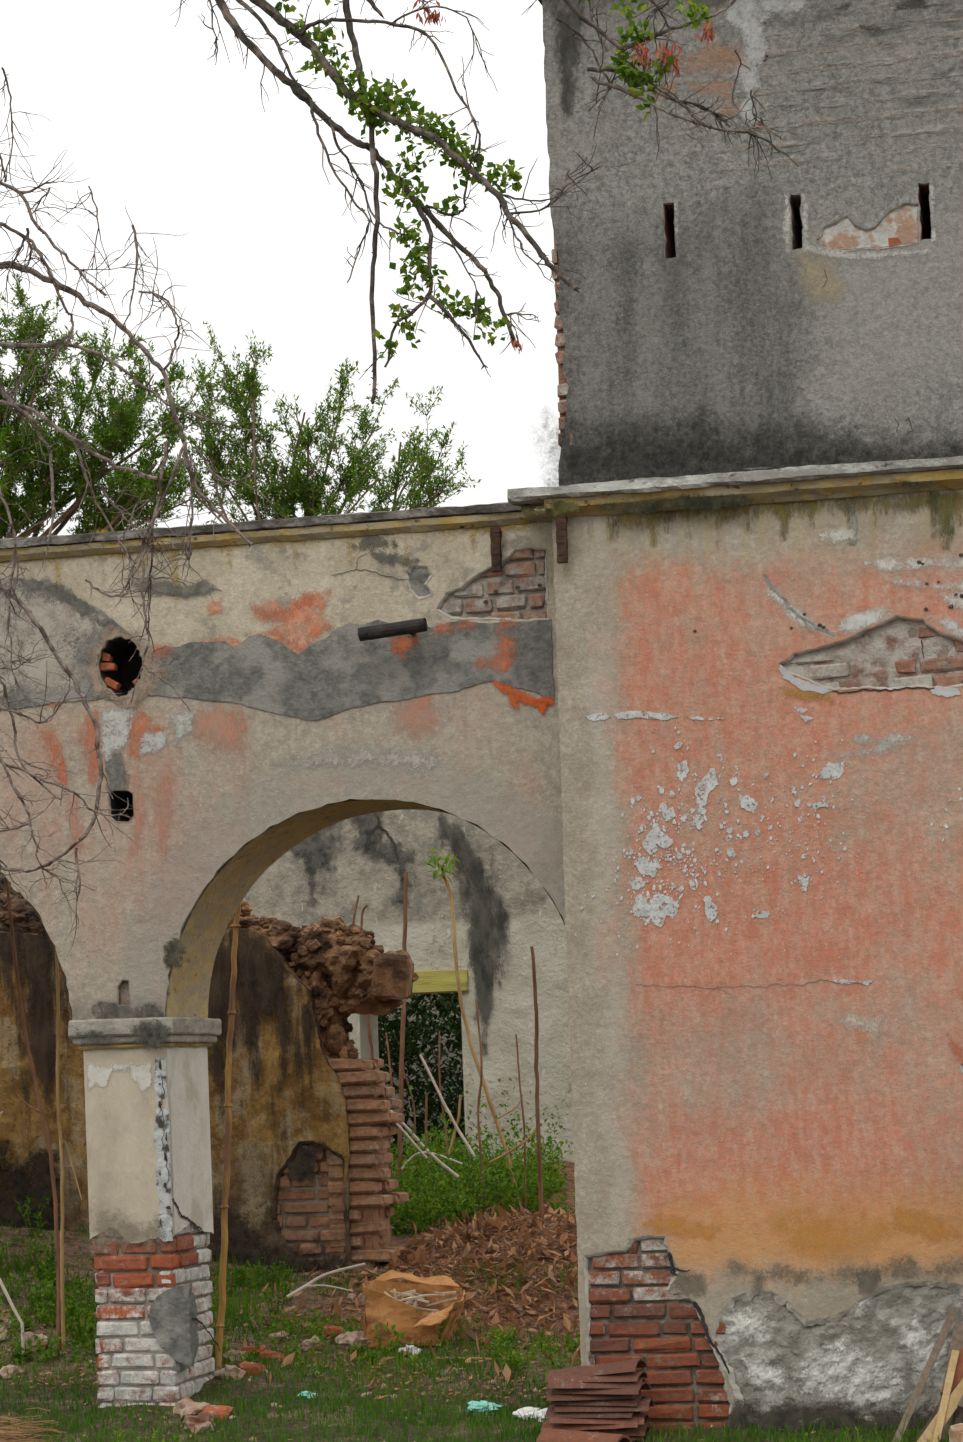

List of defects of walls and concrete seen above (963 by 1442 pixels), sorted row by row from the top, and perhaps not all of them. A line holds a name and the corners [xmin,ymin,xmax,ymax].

flaking render [782,181,936,260]
damp [470,417,963,549]
flaking render [0,547,555,761]
spalling [767,553,963,697]
peeling [580,711,917,962]
damp [76,1001,171,1051]
damp [207,931,311,1118]
damp [437,812,509,1056]
crack [636,979,871,996]
flaking render [86,1057,215,1408]
damp [209,1200,346,1273]
spalling [583,1235,963,1430]